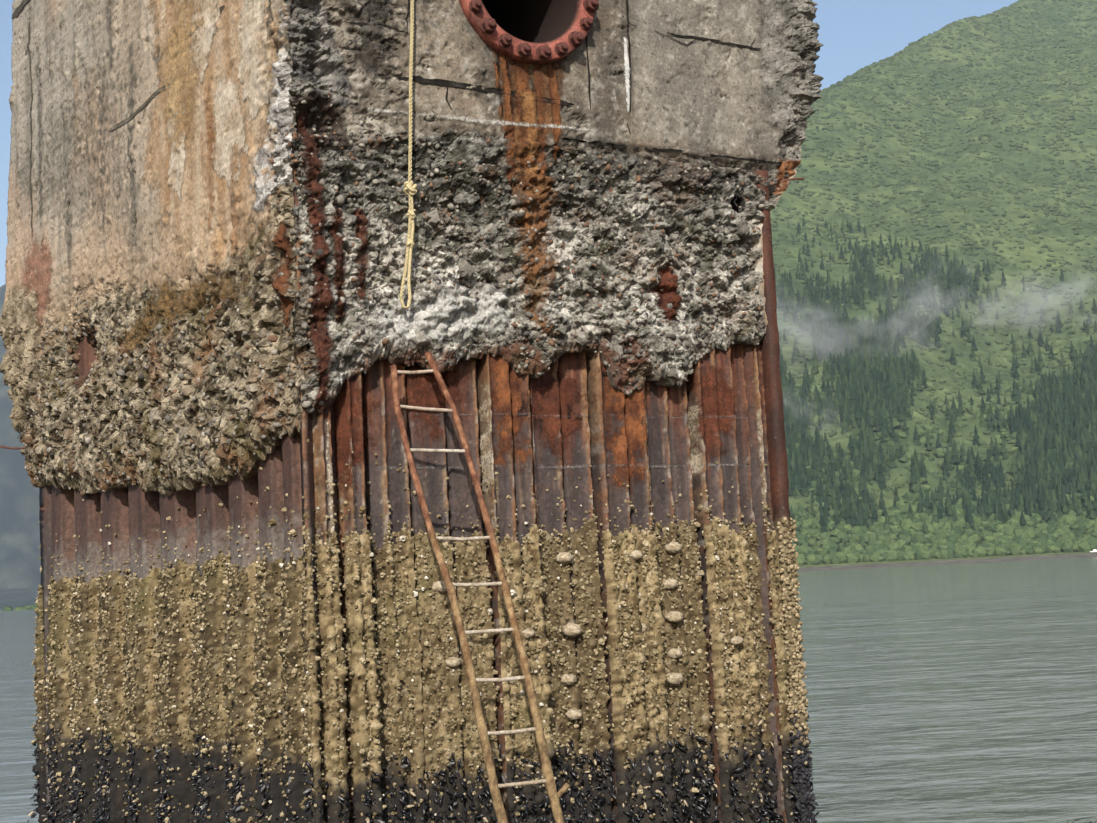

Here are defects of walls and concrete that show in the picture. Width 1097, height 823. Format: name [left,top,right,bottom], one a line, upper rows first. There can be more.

crack [12,0,33,234]
rust [153,0,215,231]
rust [272,221,295,336]
rust [296,113,379,498]
spalling [19,0,807,497]
crack [398,36,591,110]
rust [494,49,567,335]
rust [651,265,682,324]
crack [561,0,783,167]
rust [403,361,470,440]
rust [485,354,647,494]
rust [686,366,737,456]